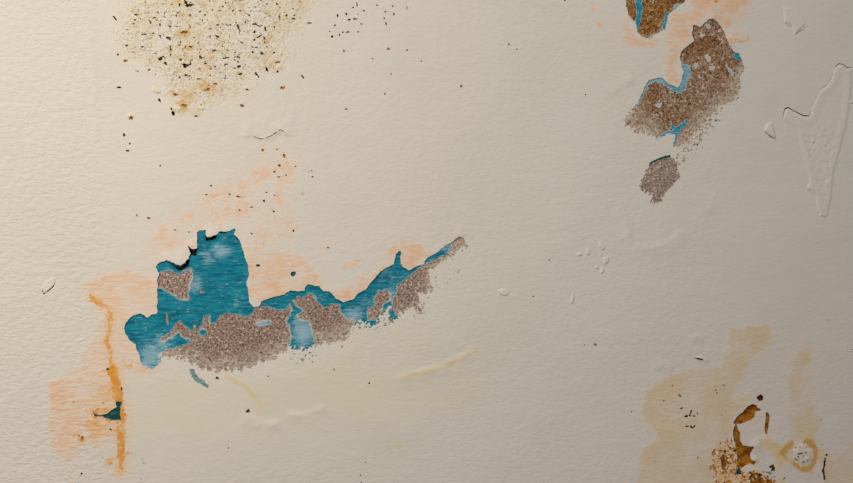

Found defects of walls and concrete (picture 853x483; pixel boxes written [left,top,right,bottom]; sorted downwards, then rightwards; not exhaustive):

peeling [626,0,685,39]
water stain [589,0,757,88]
peeling [624,19,744,205]
rust [63,269,156,483]
water stain [42,131,496,483]
peeling [124,229,468,388]
water stain [624,318,853,483]